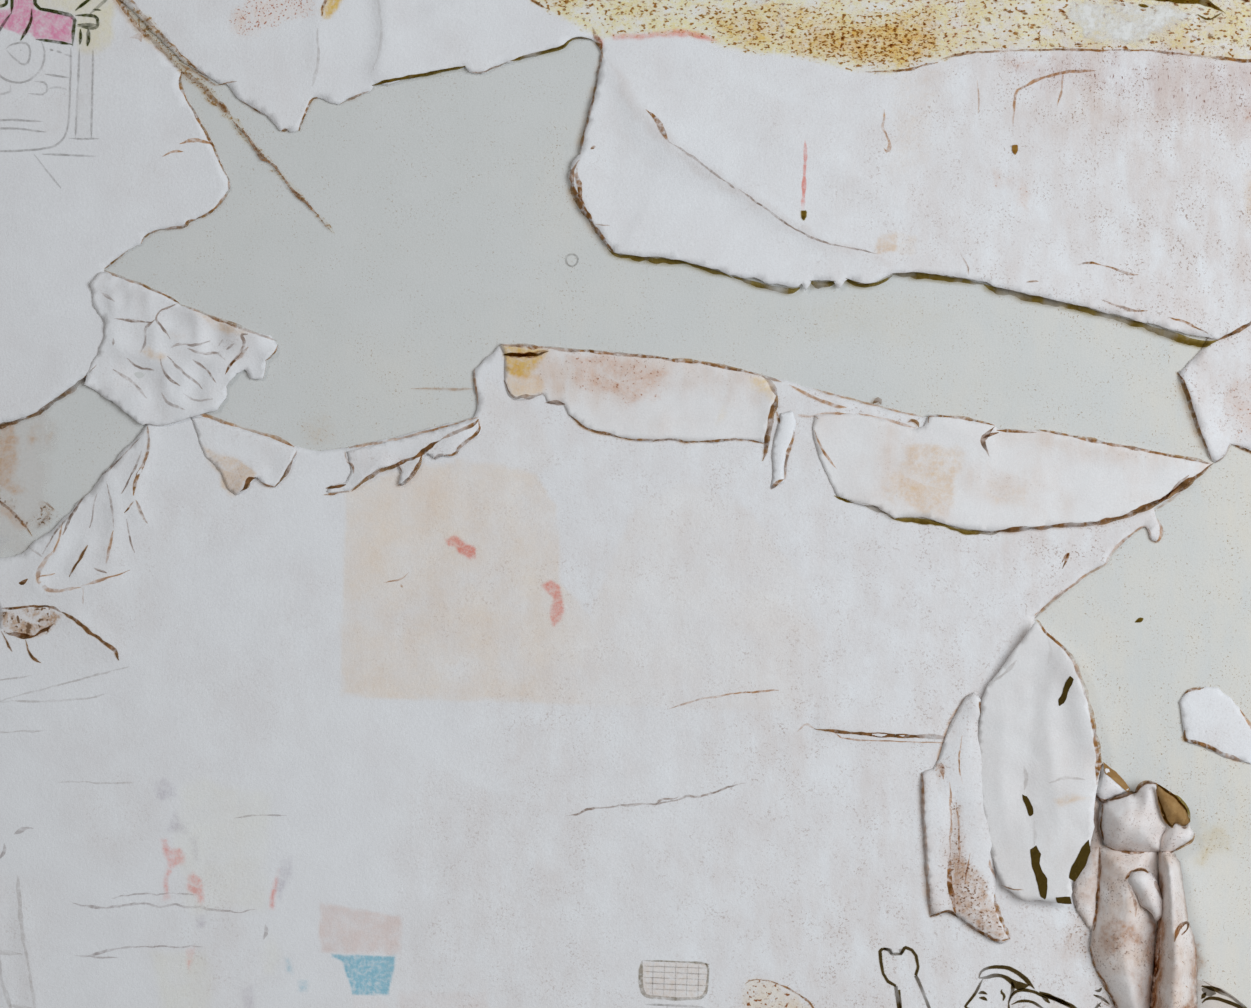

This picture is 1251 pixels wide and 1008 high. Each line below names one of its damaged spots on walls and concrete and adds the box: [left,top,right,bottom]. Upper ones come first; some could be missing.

crack [116,0,331,229]
spalling [0,413,50,552]
peeling [84,272,297,495]
peeling [500,344,796,488]
peeling [813,397,1214,535]
spalling [3,608,49,633]
peeling [1179,686,1251,764]